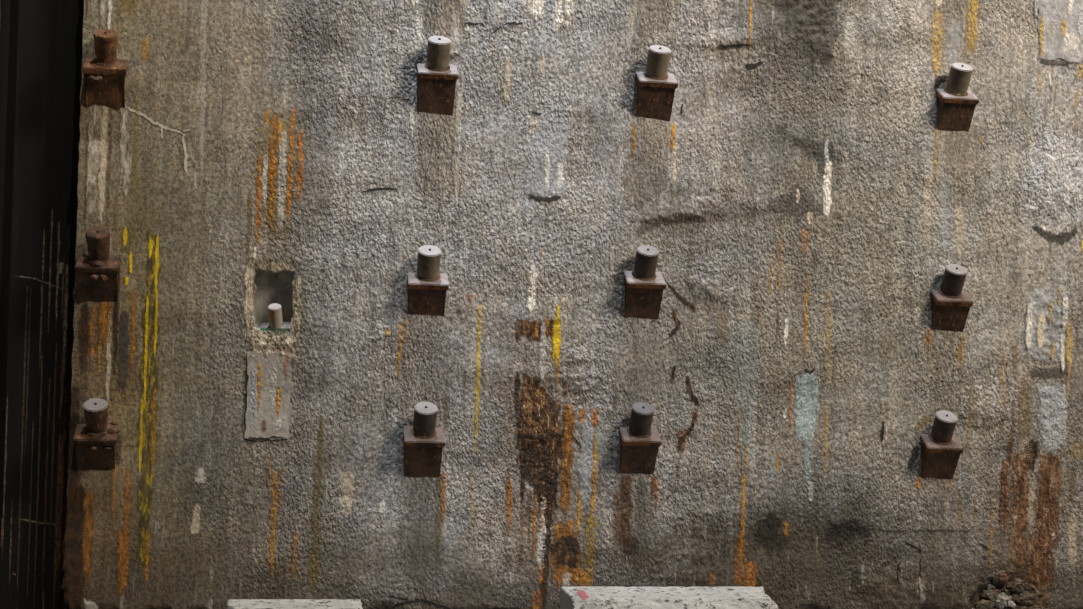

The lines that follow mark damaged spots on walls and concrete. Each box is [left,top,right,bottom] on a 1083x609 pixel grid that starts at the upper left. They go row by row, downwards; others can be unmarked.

crack [126,107,190,172]
rust [246,108,304,265]
rust [55,227,162,609]
rust [506,305,600,609]
rust [740,473,756,587]
water stain [783,368,820,482]
spalling [972,566,1050,609]
rust [998,344,1076,606]